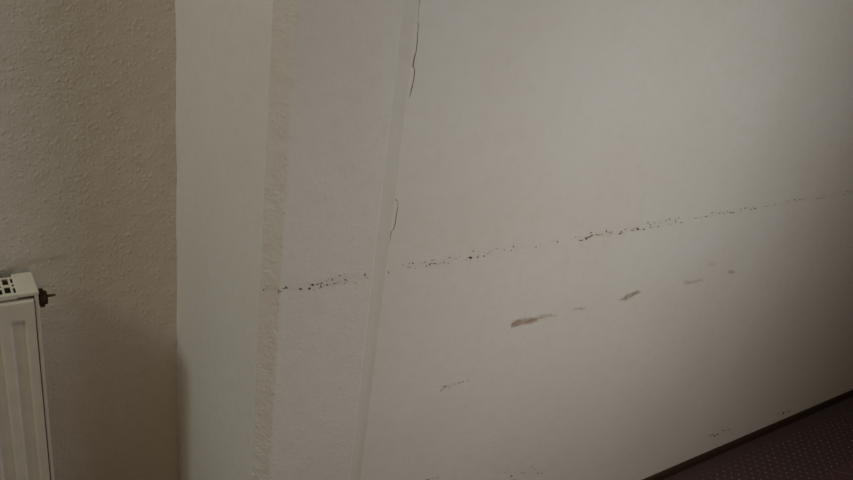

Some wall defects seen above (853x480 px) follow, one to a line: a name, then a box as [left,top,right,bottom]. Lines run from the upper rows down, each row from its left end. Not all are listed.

crack [410,25,419,95]